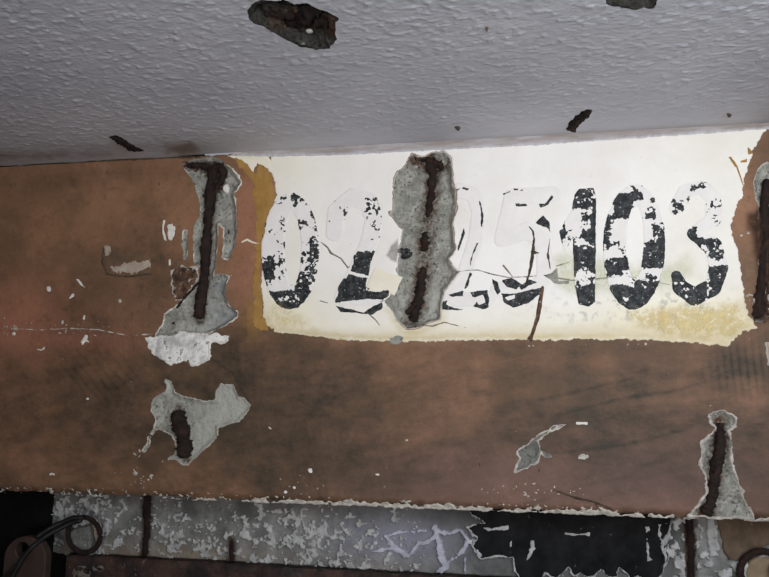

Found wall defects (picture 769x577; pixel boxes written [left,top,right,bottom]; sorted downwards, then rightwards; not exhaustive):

spalling [247,0,339,50]
spalling [606,0,657,10]
peeling [101,245,151,278]
spalling [145,156,242,367]
spalling [385,151,457,345]
spalling [740,162,769,323]
spalling [133,379,251,481]
peeling [40,410,769,577]